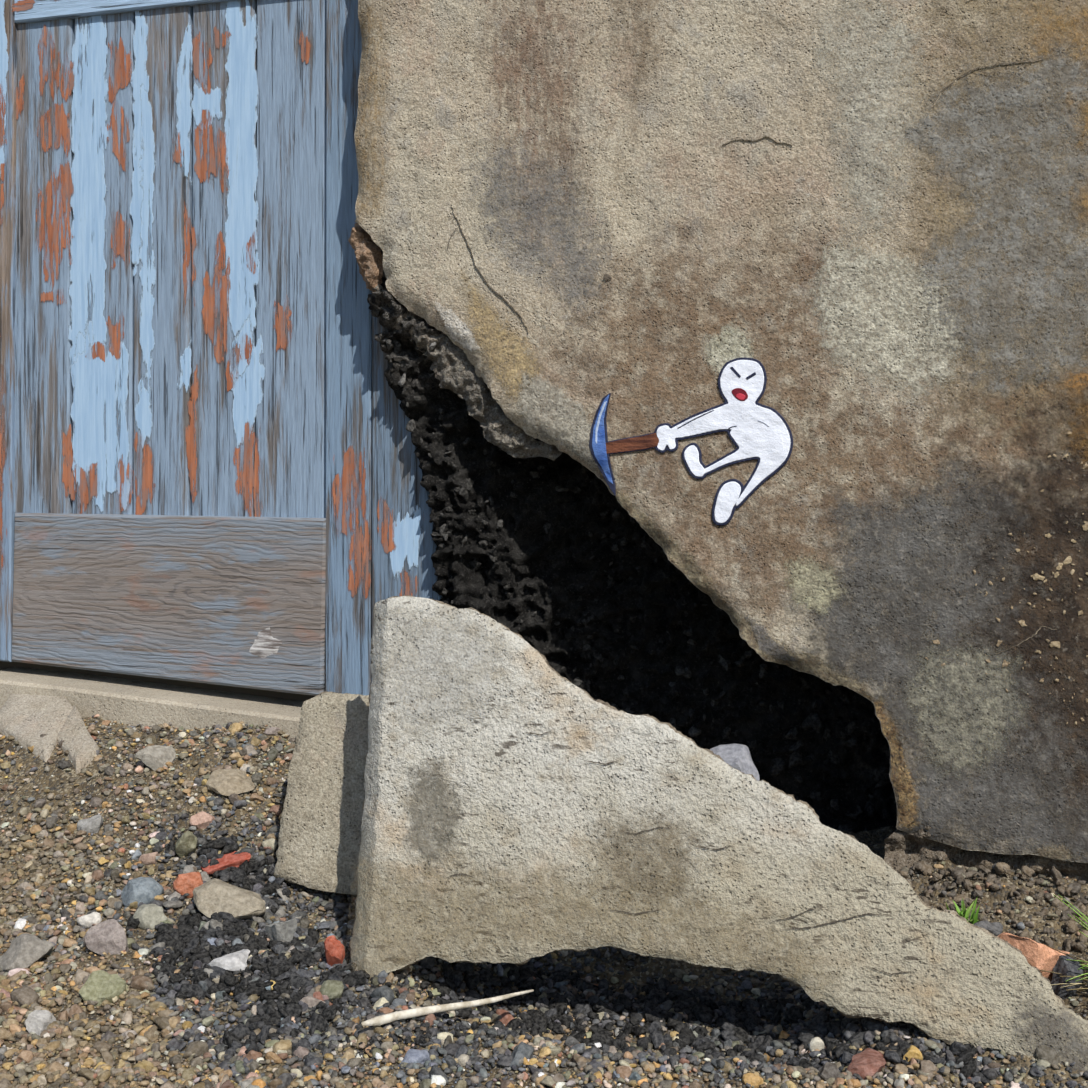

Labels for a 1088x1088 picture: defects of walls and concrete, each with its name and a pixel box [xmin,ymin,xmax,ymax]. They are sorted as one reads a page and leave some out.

peeling [0,0,36,225]
peeling [299,30,311,64]
crack [722,131,792,147]
crack [931,59,1043,108]
peeling [36,10,156,515]
peeling [172,0,292,517]
crack [448,207,529,334]
water stain [581,0,1088,862]
spalling [328,223,919,842]
flaking render [1024,521,1088,615]
flaking render [1036,639,1074,682]